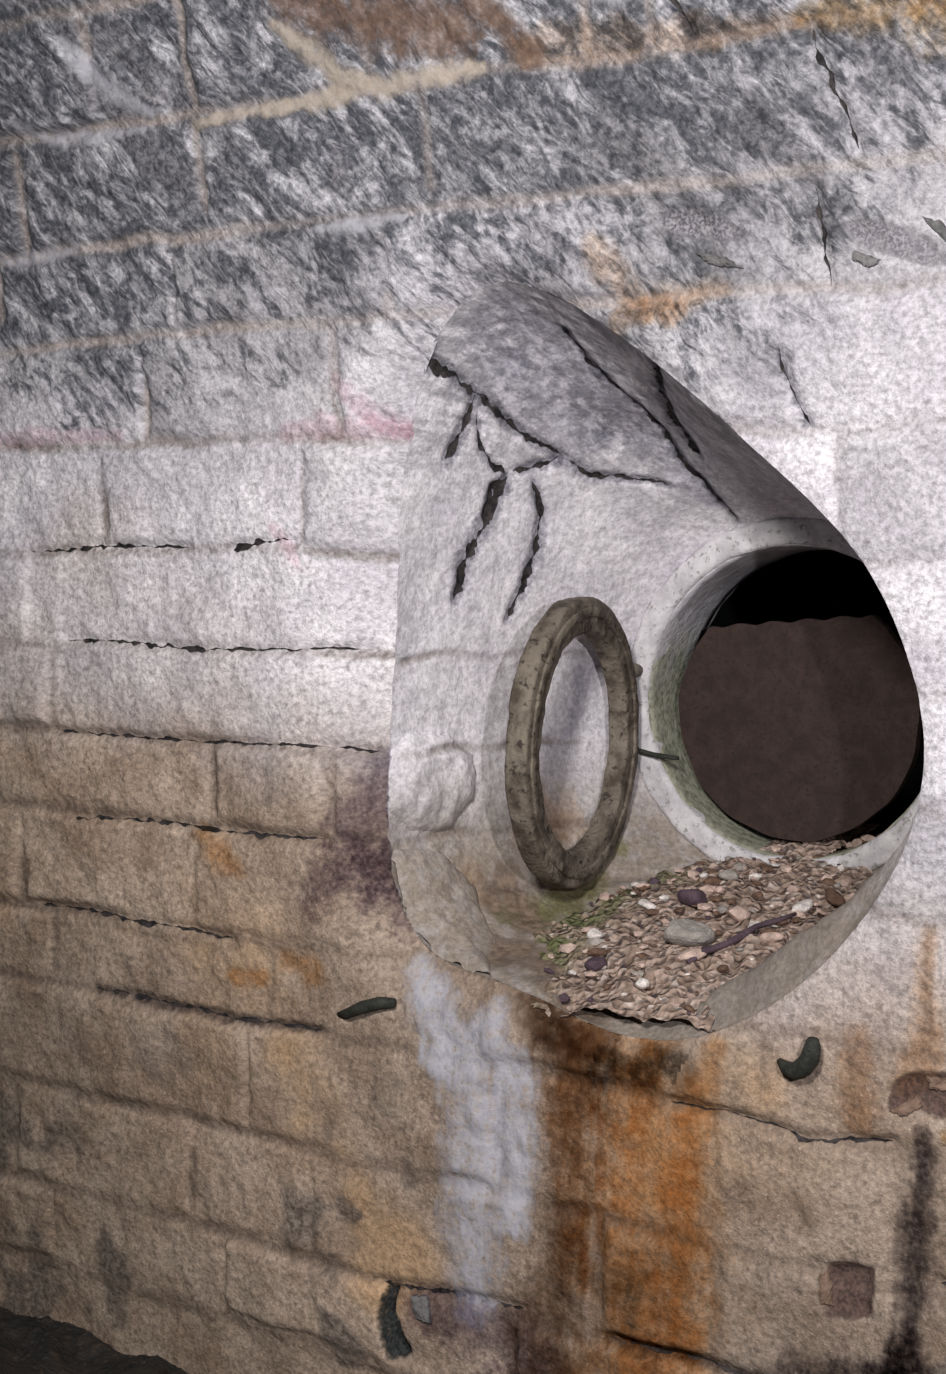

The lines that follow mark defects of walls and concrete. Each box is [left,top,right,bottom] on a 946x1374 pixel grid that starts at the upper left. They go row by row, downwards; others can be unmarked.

corrosion [281,0,541,68]
crack [428,328,738,618]
efflorescence [409,958,535,1325]
spalling [818,1261,875,1320]
damp [828,1132,932,1374]
spalling [889,1071,946,1118]